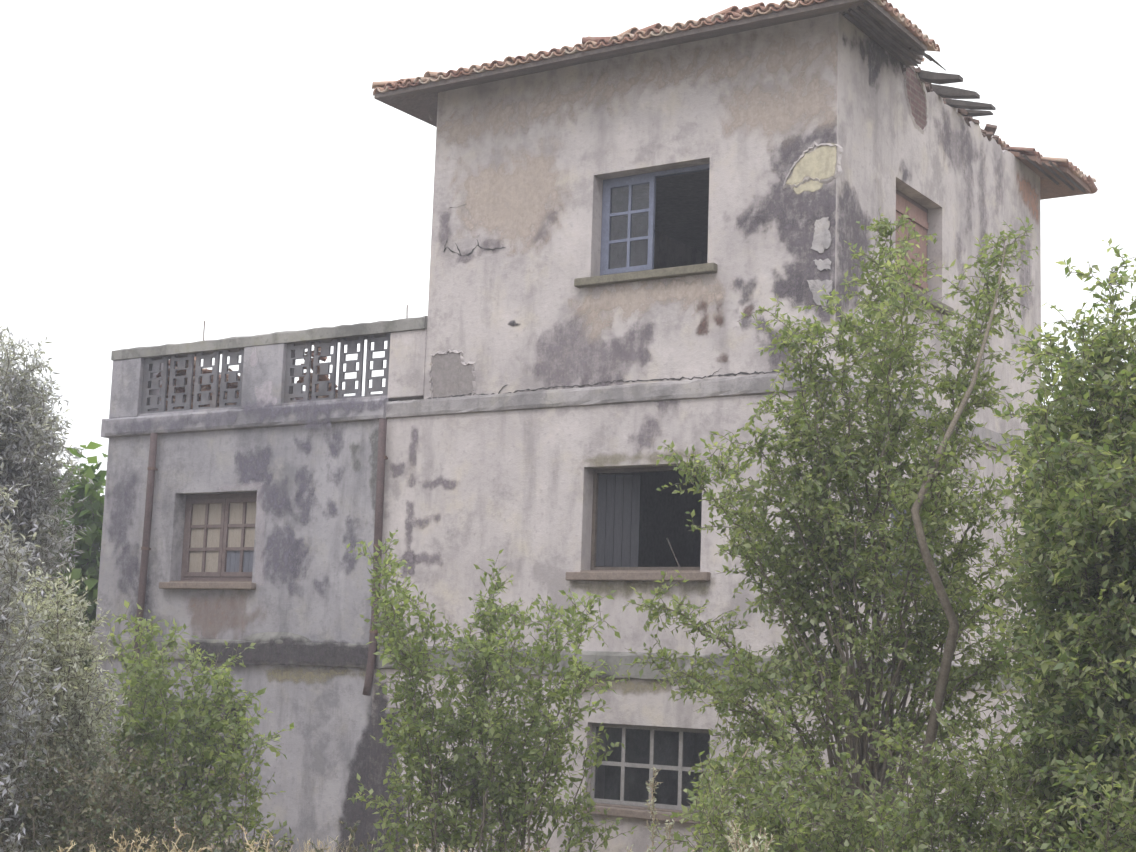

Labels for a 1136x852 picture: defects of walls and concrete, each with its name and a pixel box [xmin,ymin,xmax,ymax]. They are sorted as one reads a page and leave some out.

damp [439,32,904,322]
peeling [783,141,843,194]
crack [443,239,506,256]
damp [535,278,723,389]
damp [118,381,385,594]
damp [391,429,456,489]
damp [402,502,440,577]
damp [189,593,389,669]
damp [337,683,406,852]